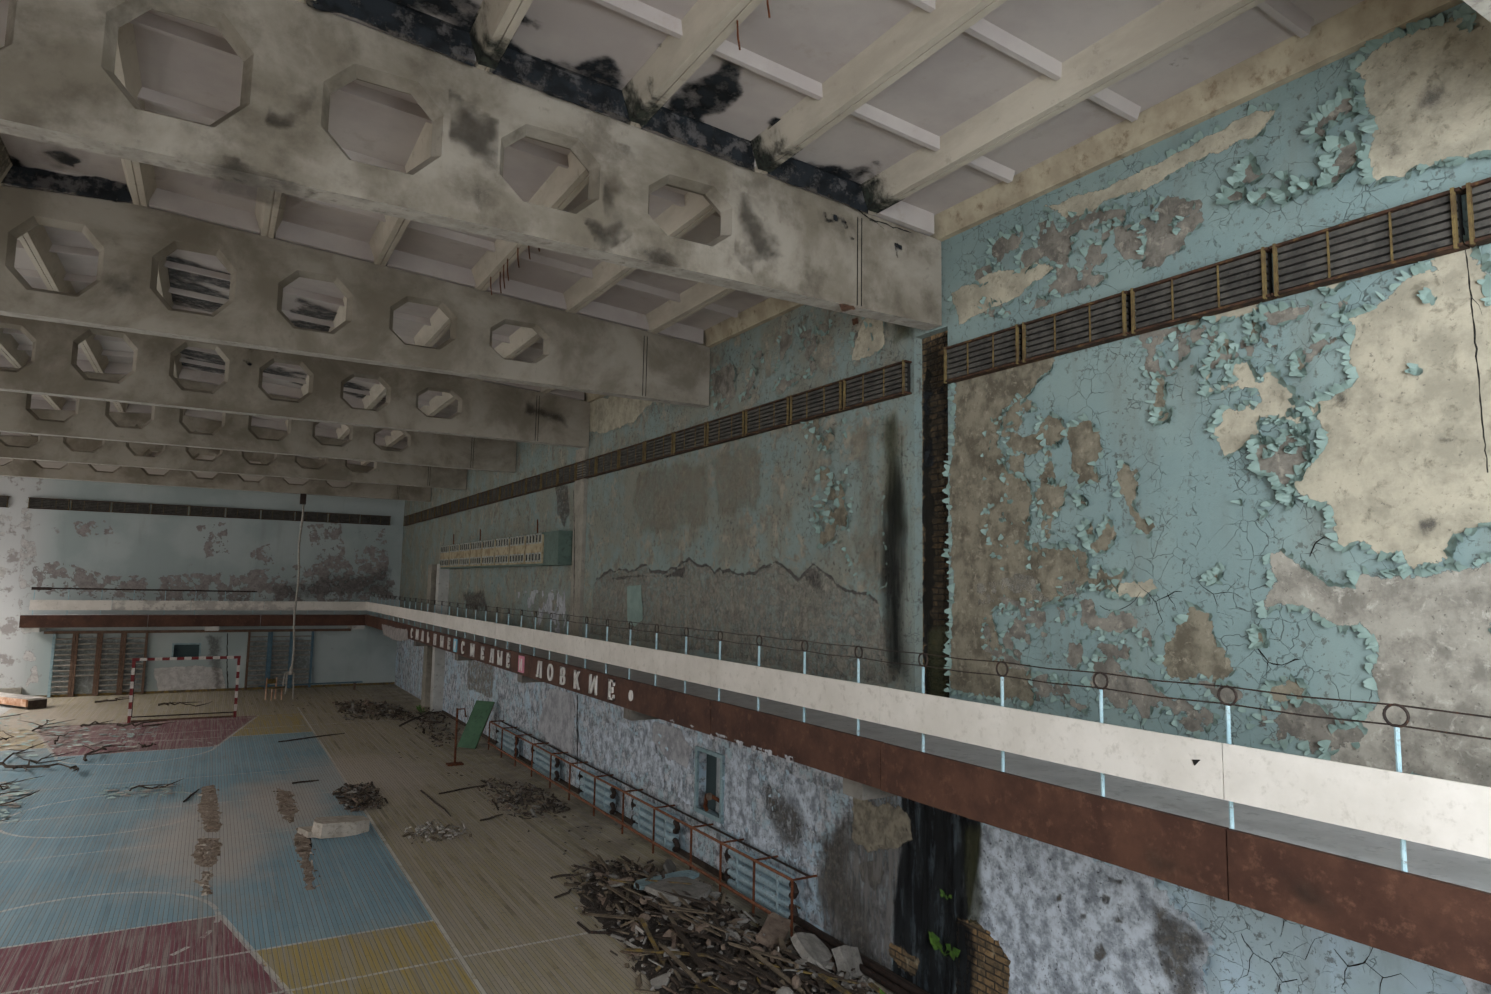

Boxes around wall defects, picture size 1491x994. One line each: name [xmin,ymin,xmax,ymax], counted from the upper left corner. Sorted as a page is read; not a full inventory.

damp [306,0,901,214]
peeling [947,4,1491,325]
crack [1463,227,1489,473]
peeling [154,665,226,691]
peeling [32,520,399,602]
peeling [382,624,408,641]
damp [590,420,904,686]
peeling [941,235,1491,787]
peeling [954,825,1216,994]
crack [1234,919,1413,994]